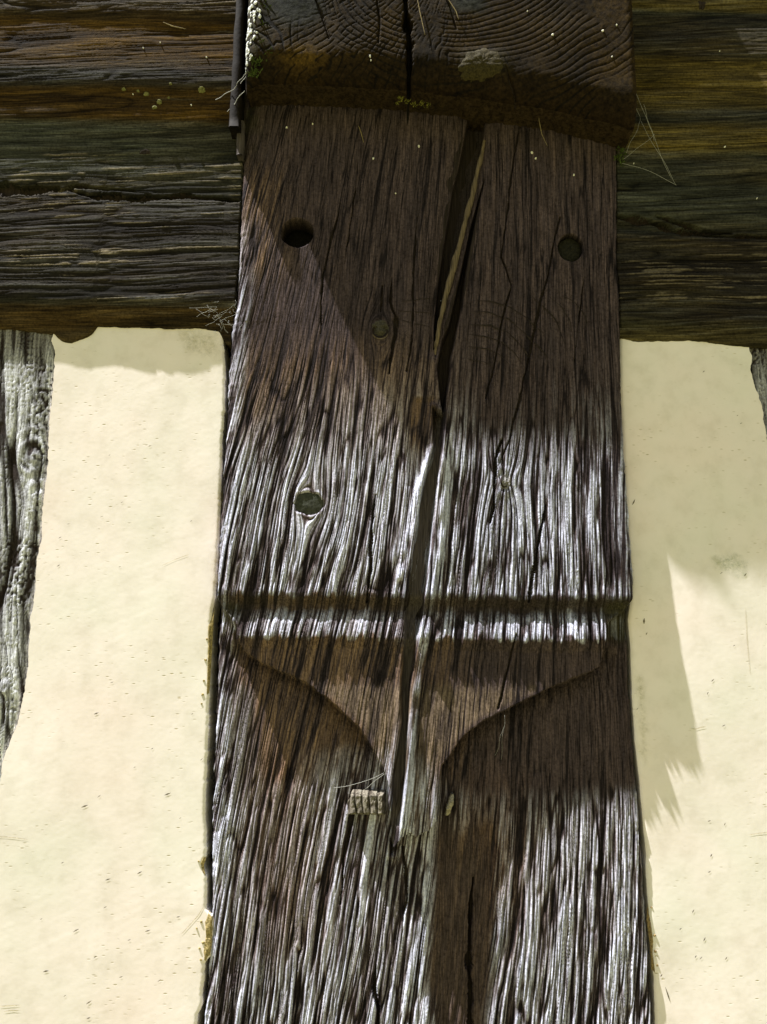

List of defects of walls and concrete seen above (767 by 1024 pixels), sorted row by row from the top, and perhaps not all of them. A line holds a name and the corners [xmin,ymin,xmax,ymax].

crack [377,0,412,124]
crack [372,126,588,915]